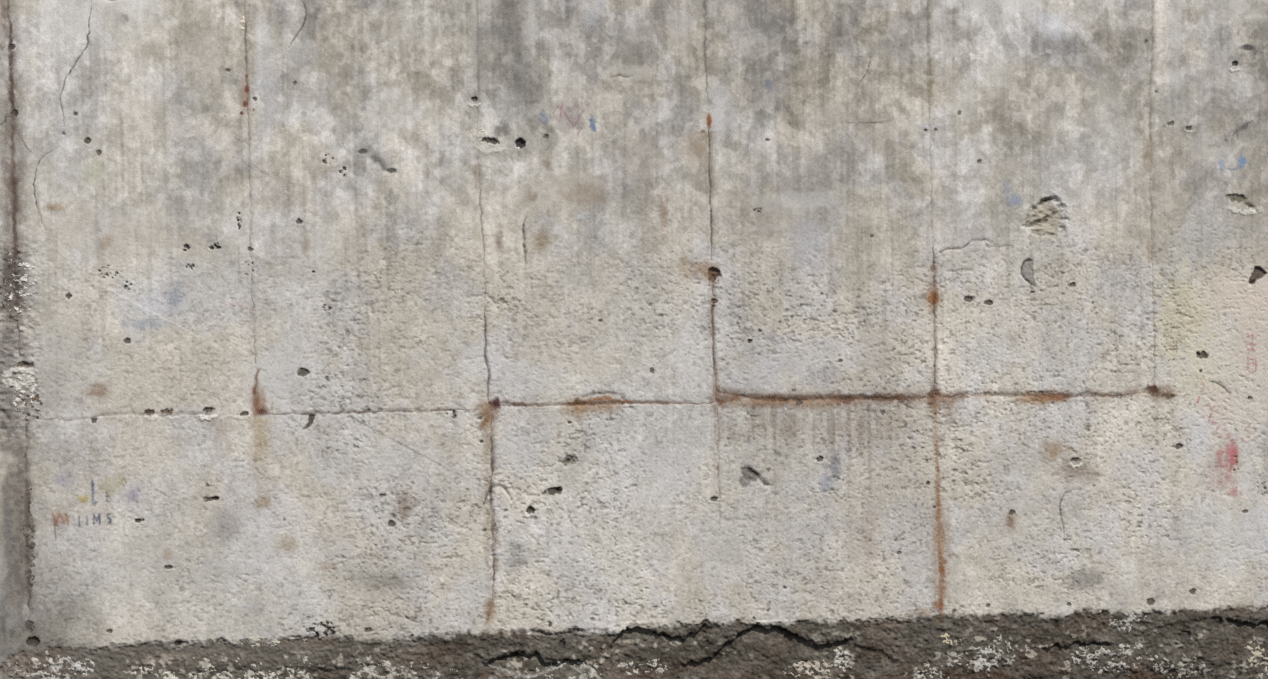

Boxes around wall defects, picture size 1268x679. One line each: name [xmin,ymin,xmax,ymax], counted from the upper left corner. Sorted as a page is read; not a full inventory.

crack [8,6,37,284]
spalling [1025,198,1064,240]
rust [482,397,527,424]
rust [570,392,632,412]
rust [1027,393,1071,402]
crack [0,408,105,606]
rust [927,468,946,575]